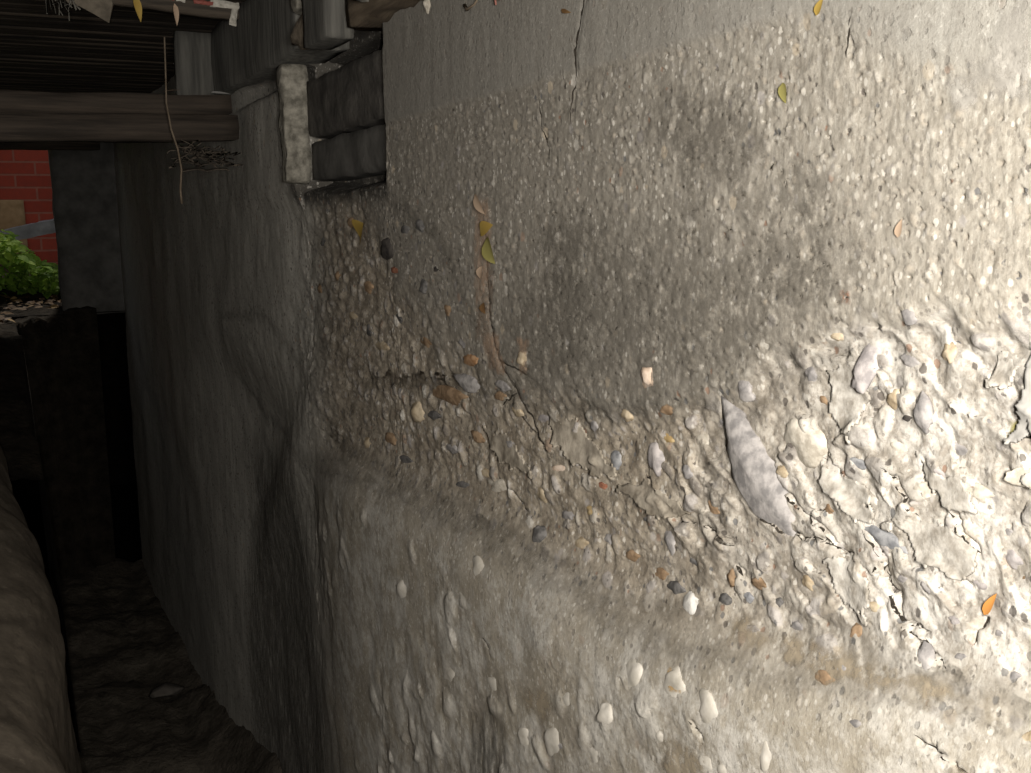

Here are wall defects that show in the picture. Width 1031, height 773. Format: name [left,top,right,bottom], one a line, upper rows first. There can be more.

crack [570,0,585,121]
leakage [662,96,746,163]
crack [483,205,552,458]
leakage [507,232,797,396]
spalling [296,186,1031,712]
leakage [662,741,702,773]